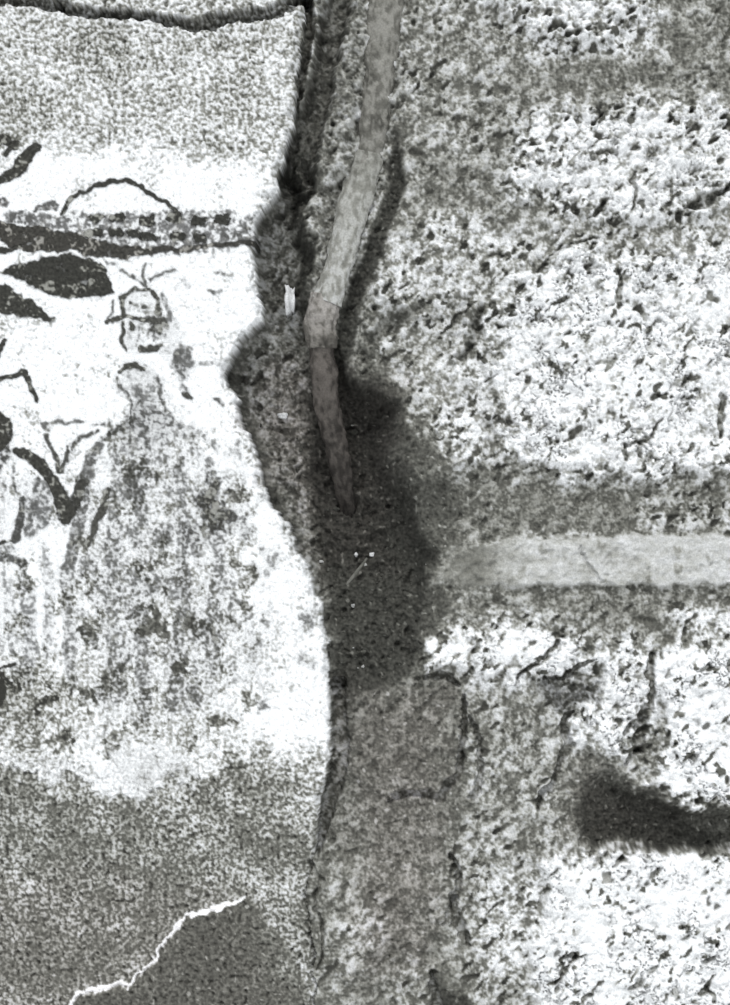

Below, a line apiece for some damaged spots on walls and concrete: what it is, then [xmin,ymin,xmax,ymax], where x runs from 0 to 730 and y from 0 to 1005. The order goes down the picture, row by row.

spalling [69,896,309,1005]
crack [0,0,438,970]